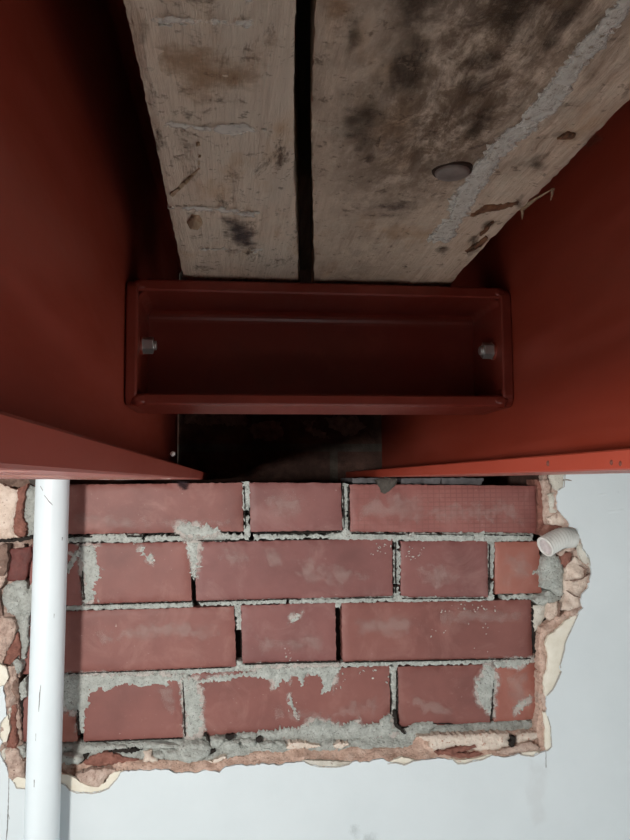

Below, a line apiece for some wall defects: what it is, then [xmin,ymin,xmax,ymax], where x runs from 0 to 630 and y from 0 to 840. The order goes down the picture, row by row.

water stain [426,0,630,244]
spalling [0,479,35,789]
spalling [61,475,591,794]